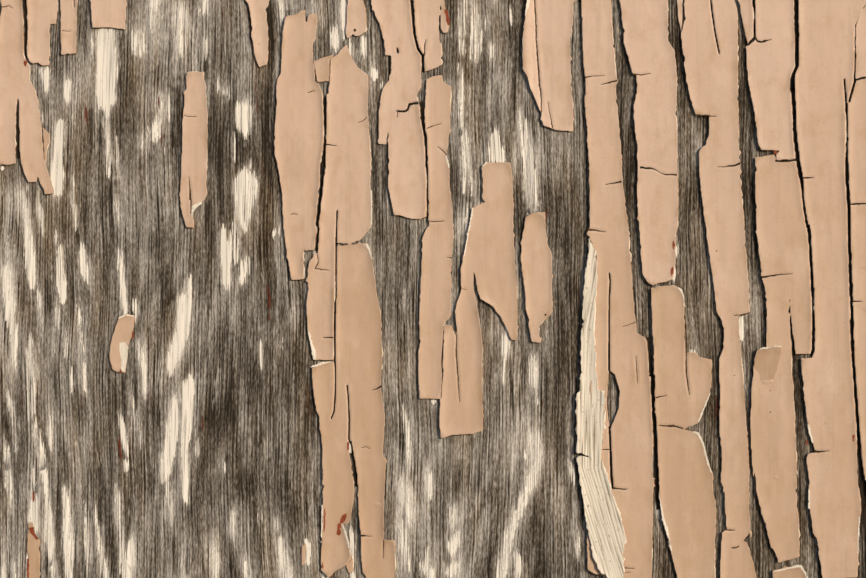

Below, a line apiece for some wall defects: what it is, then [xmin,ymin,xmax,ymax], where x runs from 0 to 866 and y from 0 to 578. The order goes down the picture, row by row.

peeling [0,0,78,195]
peeling [109,313,135,373]
peeling [179,71,208,228]
peeling [246,0,270,67]
crack [290,90,370,487]
crack [396,0,426,72]
peeling [274,0,553,578]
crack [397,101,447,222]
crack [608,273,683,510]
peeling [522,0,866,578]
crack [775,0,815,356]
crack [844,24,866,524]